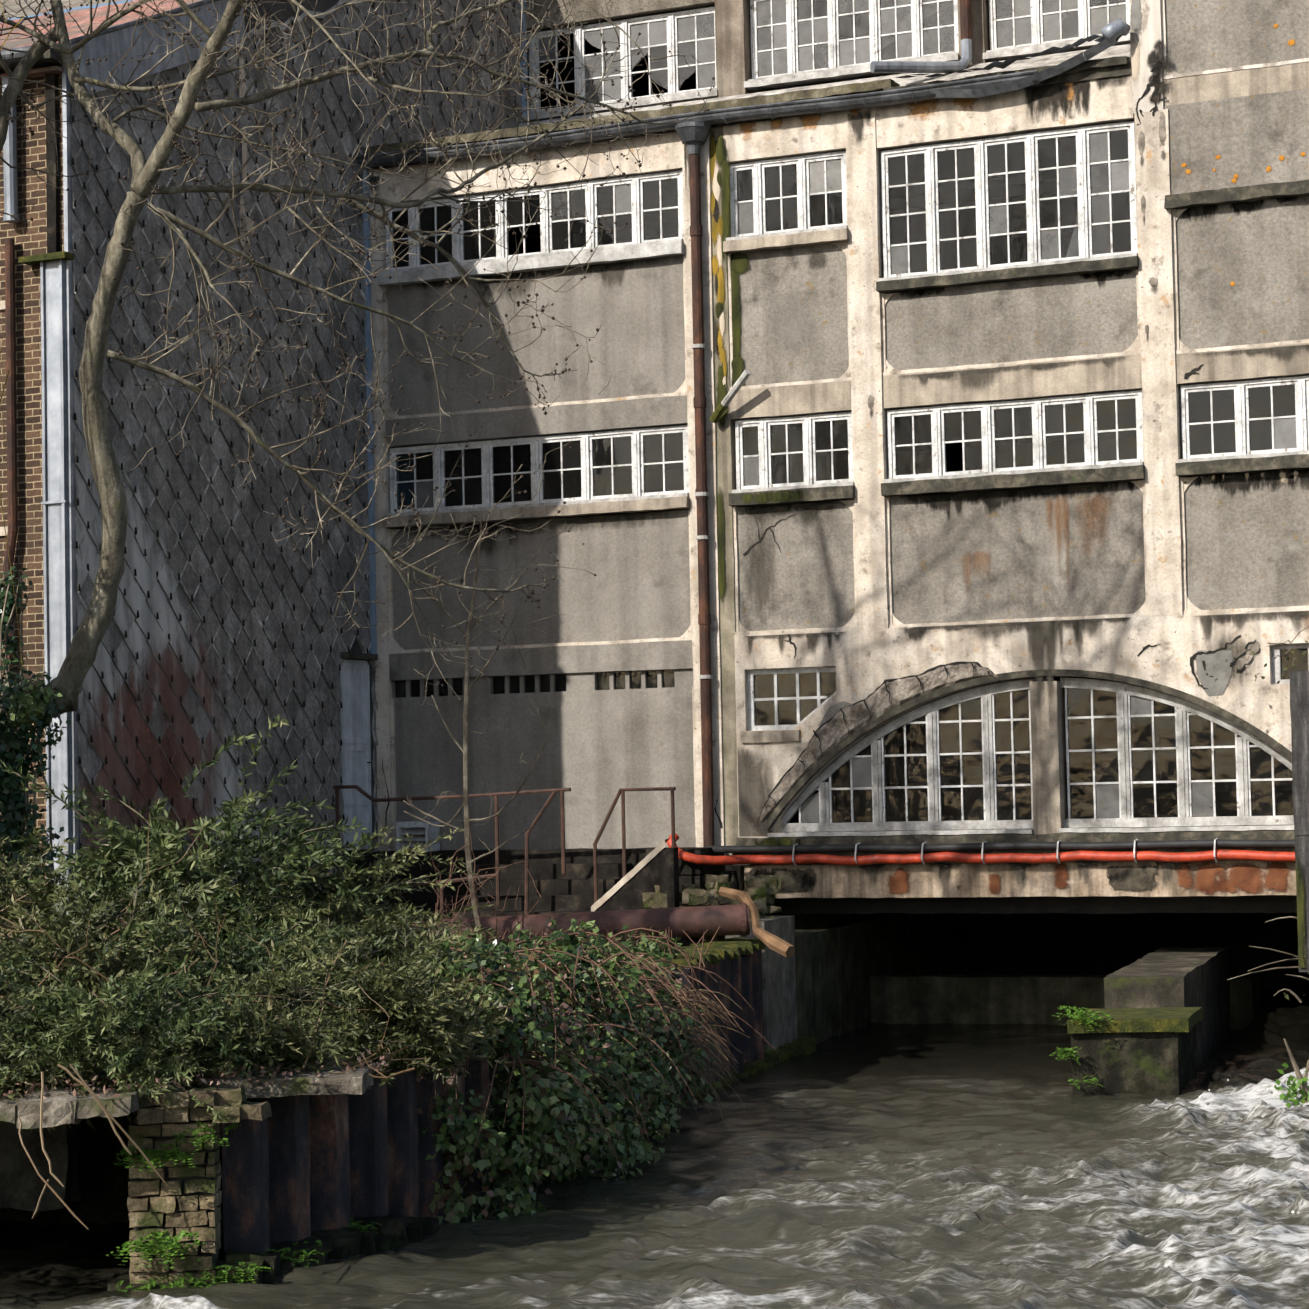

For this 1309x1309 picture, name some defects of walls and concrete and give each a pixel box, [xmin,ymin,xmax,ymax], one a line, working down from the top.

damp [740,119,782,135]
damp [800,114,821,129]
damp [907,99,938,120]
damp [954,98,977,109]
damp [1025,76,1127,118]
damp [709,134,750,427]
crack [743,514,795,557]
spalling [1190,635,1261,696]
spalling [753,868,817,893]
spalling [1106,865,1158,891]